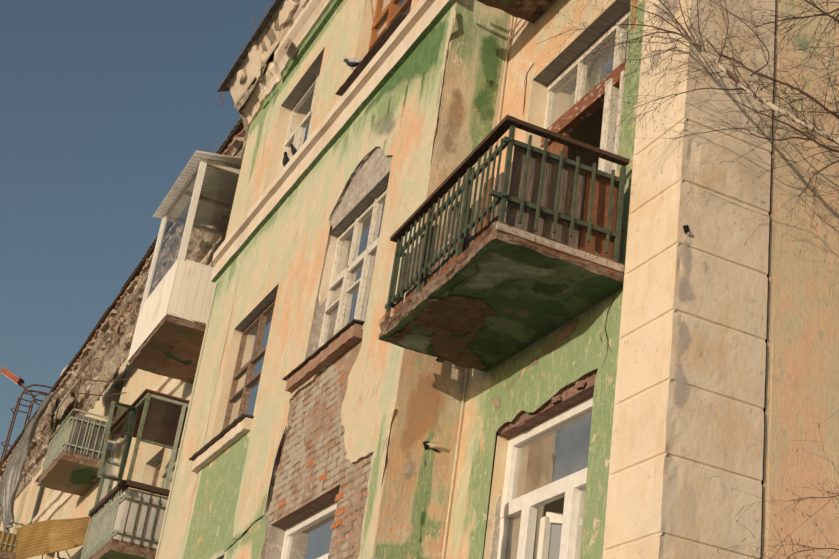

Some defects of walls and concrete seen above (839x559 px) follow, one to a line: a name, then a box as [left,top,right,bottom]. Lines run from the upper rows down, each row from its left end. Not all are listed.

peeling [233,0,308,111]
damp [366,22,445,146]
spalling [388,253,556,369]
spalling [51,390,75,423]
spalling [89,346,130,409]
crack [224,426,286,552]
peeling [330,492,345,530]